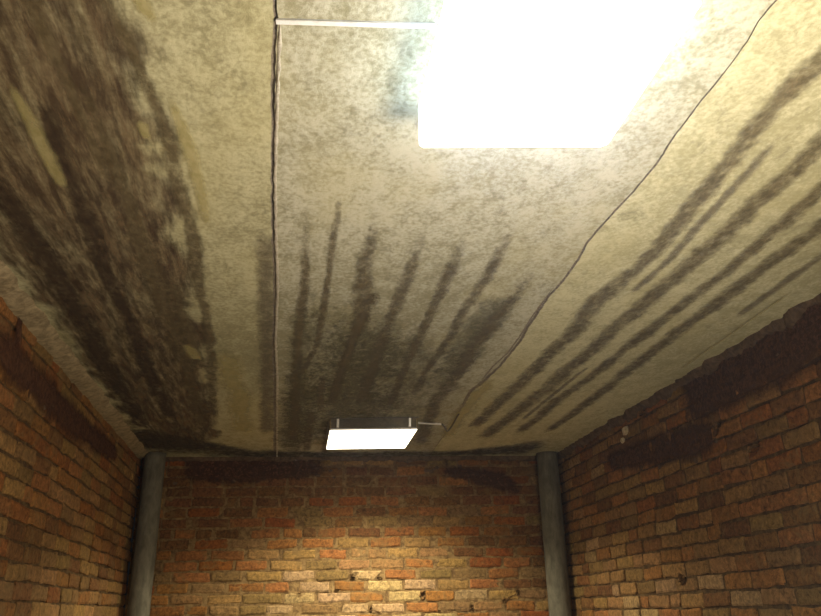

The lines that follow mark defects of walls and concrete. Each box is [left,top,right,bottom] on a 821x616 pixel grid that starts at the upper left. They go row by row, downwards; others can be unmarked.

leakage [0,0,538,457]
crack [270,0,282,457]
crack [432,0,777,452]
leakage [444,53,821,437]